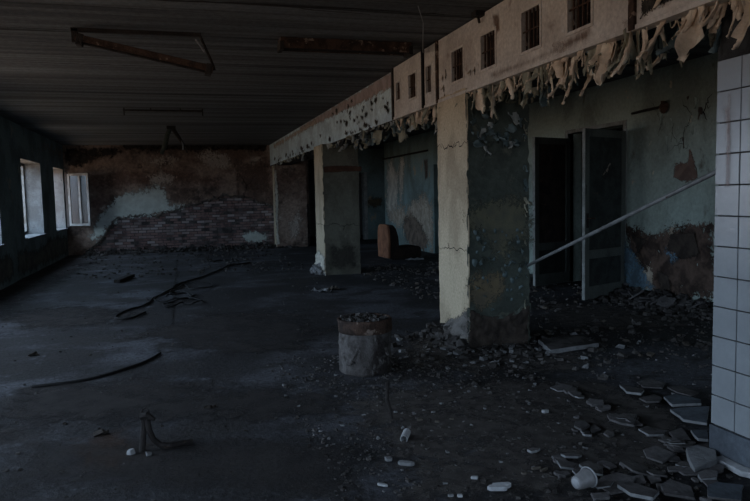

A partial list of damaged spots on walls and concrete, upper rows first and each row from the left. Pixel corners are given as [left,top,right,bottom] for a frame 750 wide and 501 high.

peeling [274,69,447,152]
peeling [455,0,750,156]
flaking render [673,96,703,183]
flaking render [83,141,314,255]
spalling [443,165,535,348]
flaking render [624,219,715,302]